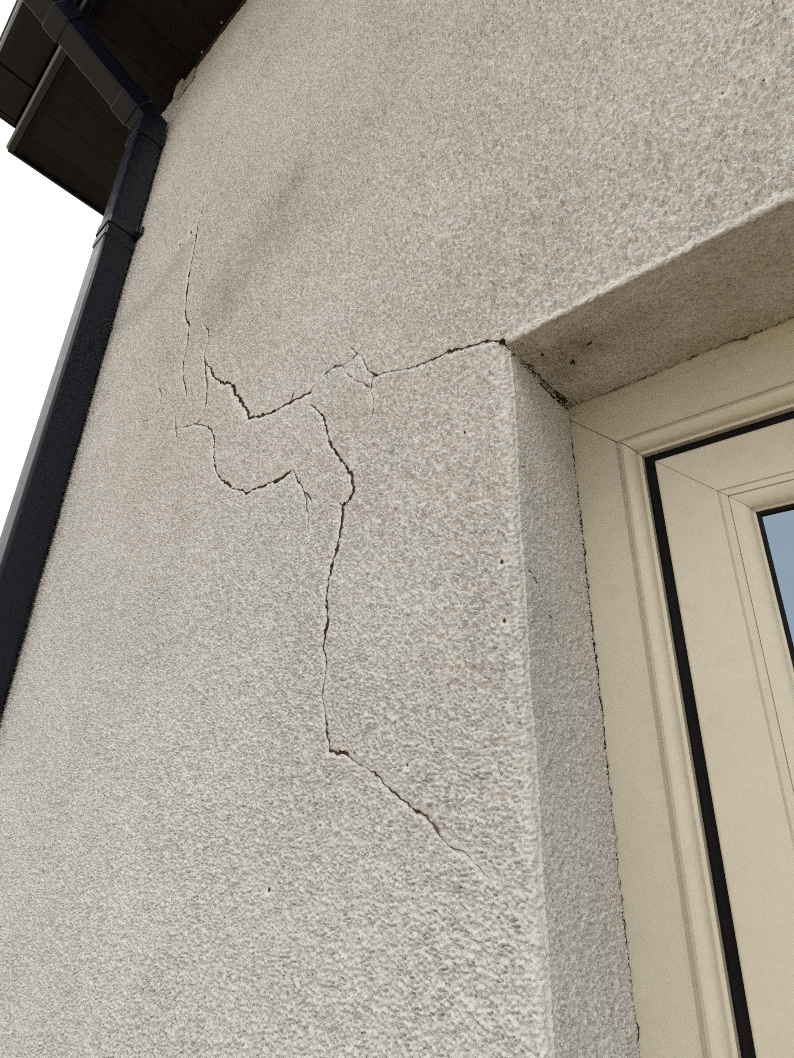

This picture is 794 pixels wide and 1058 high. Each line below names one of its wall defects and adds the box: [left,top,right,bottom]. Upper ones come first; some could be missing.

crack [144,71,569,878]